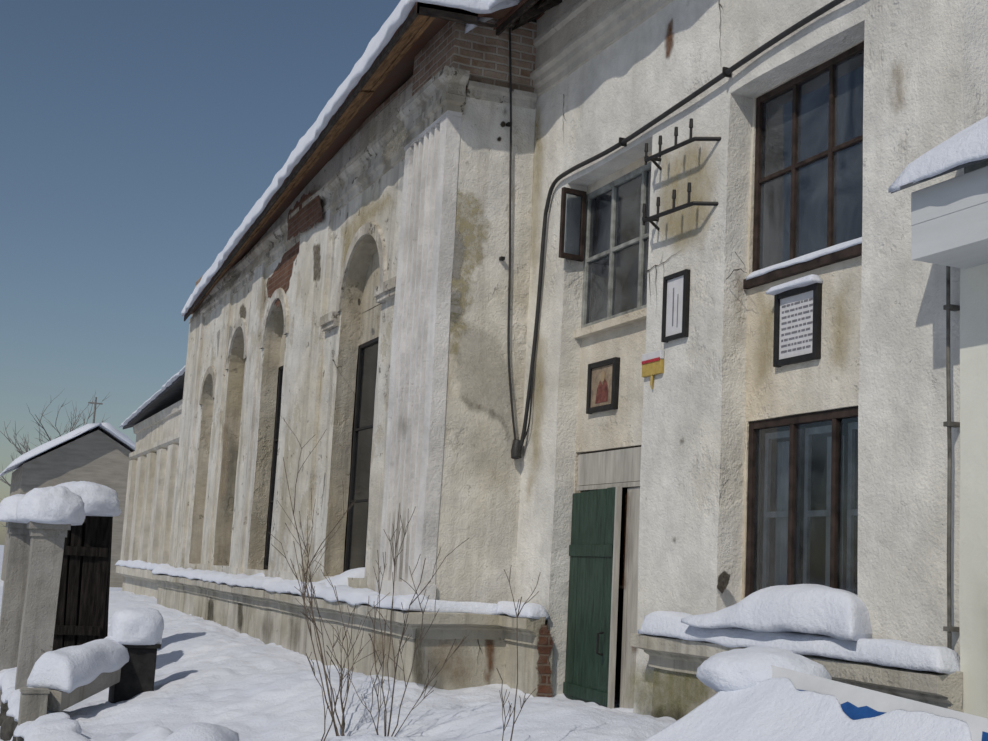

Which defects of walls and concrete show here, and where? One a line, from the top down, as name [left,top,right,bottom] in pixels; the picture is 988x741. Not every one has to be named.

flaking render [266,192,322,307]
flaking render [536,624,553,697]